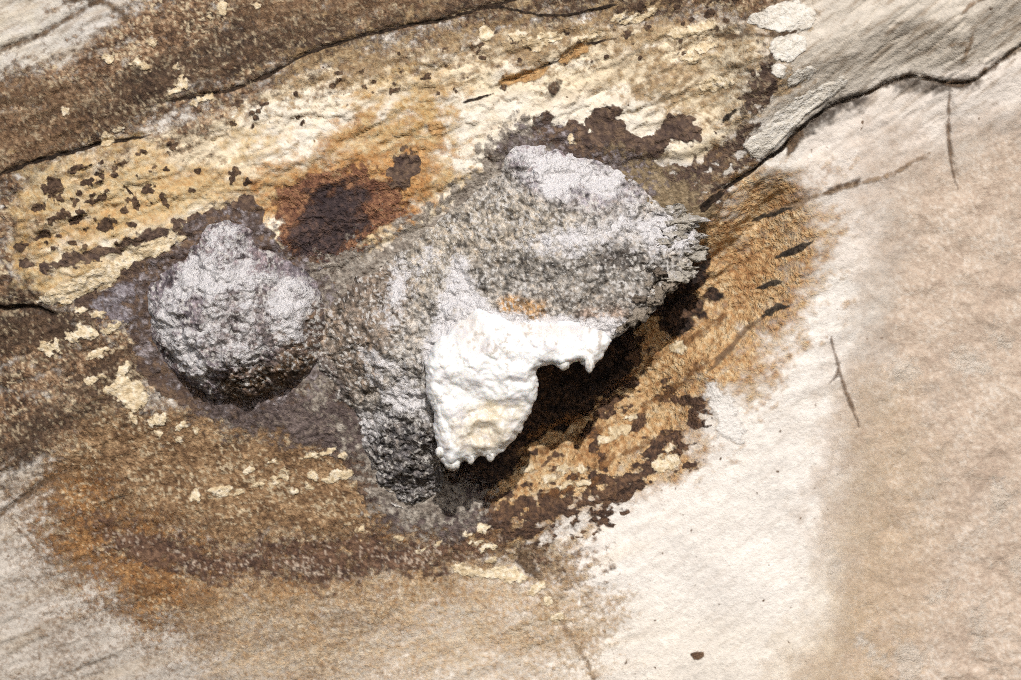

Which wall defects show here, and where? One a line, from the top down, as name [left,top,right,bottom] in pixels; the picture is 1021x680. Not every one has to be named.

crack [0,0,128,51]
crack [0,134,150,175]
peeling [167,62,188,95]
corrosion [11,67,470,292]
crack [146,0,617,107]
crack [700,36,1021,213]
damp [0,0,801,632]
corrosion [443,170,843,567]
spalling [713,303,790,368]
peeling [520,464,591,490]
peeling [651,443,680,473]
corrosion [19,470,583,680]